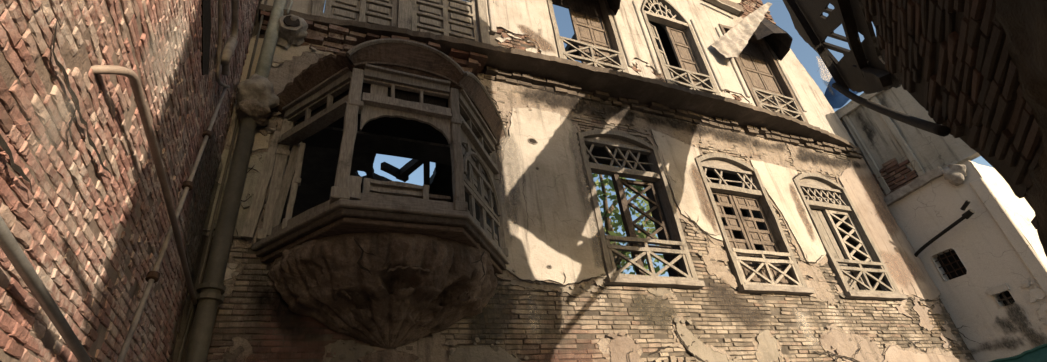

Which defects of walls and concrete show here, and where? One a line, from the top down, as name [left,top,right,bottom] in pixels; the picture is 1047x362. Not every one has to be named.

spalling [488,28,542,53]
flaking render [221,255,247,297]
spalling [495,269,607,299]
flaking render [645,287,676,302]
spalling [693,226,737,289]
spalling [797,260,846,307]
flaking render [322,339,377,362]
flaking render [393,329,459,362]
flaking render [596,331,644,362]
flaking render [671,314,784,362]
flaking render [818,324,888,362]
spalling [894,297,960,349]